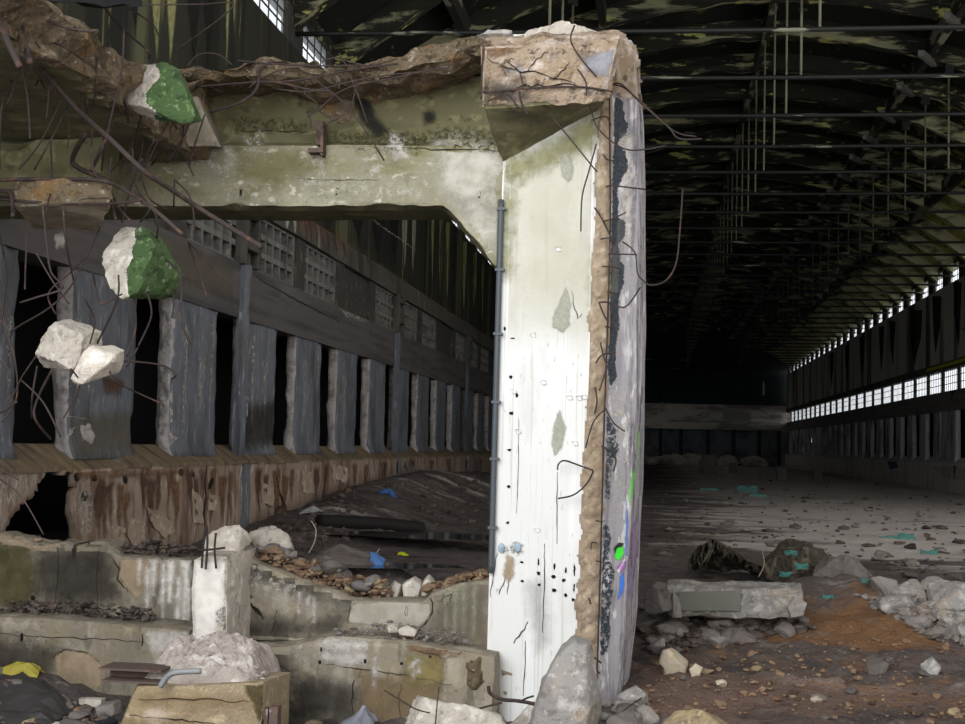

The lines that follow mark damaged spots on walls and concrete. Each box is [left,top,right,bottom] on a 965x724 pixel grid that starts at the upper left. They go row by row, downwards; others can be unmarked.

water stain [354,99,386,137]
spalling [0,2,450,453]
spalling [478,25,702,682]
spalling [0,479,60,553]
corrosion [77,469,233,533]
corrosion [255,470,294,514]
corrosion [314,466,328,495]